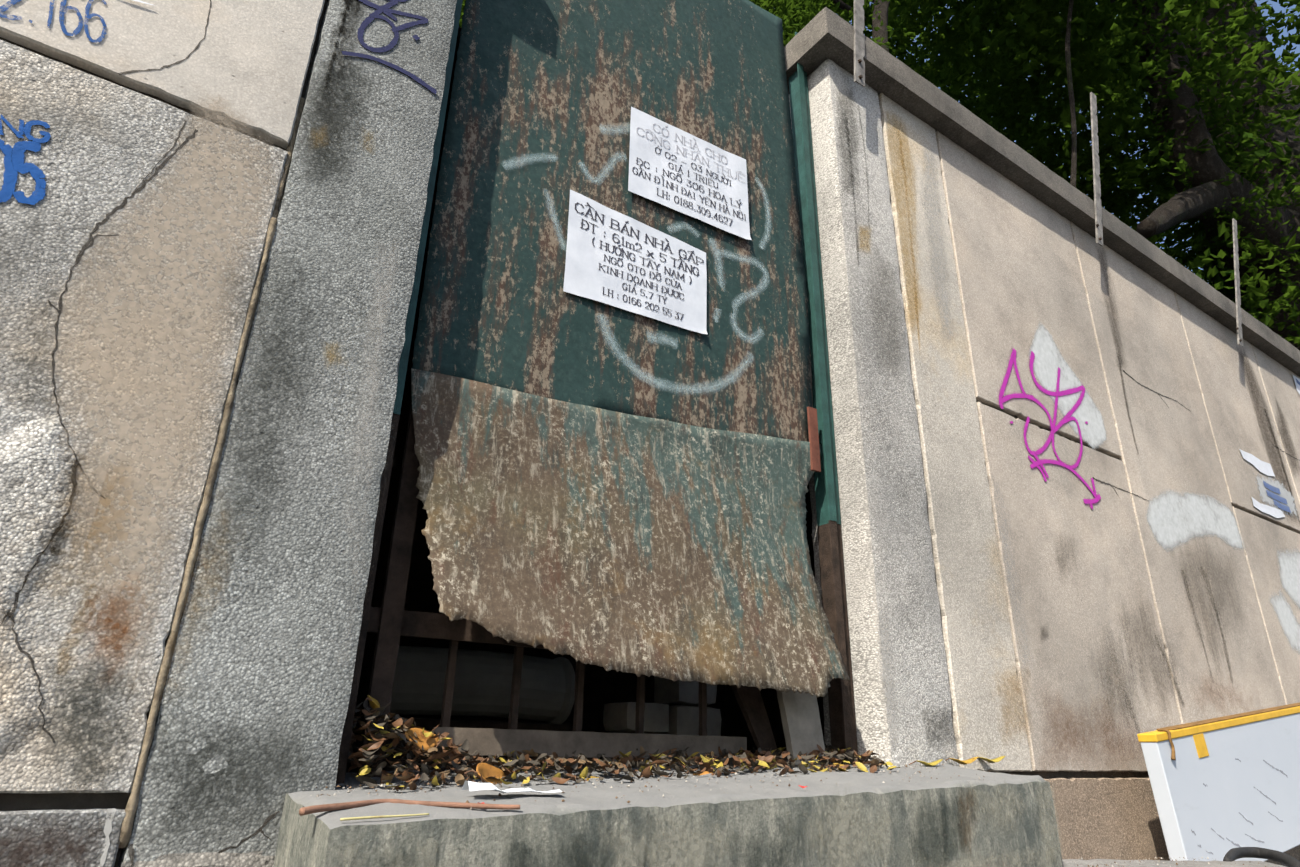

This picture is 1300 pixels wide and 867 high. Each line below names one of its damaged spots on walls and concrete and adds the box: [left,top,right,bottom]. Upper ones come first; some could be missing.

crack [118,0,212,75]
water stain [325,0,360,108]
crack [1,120,198,743]